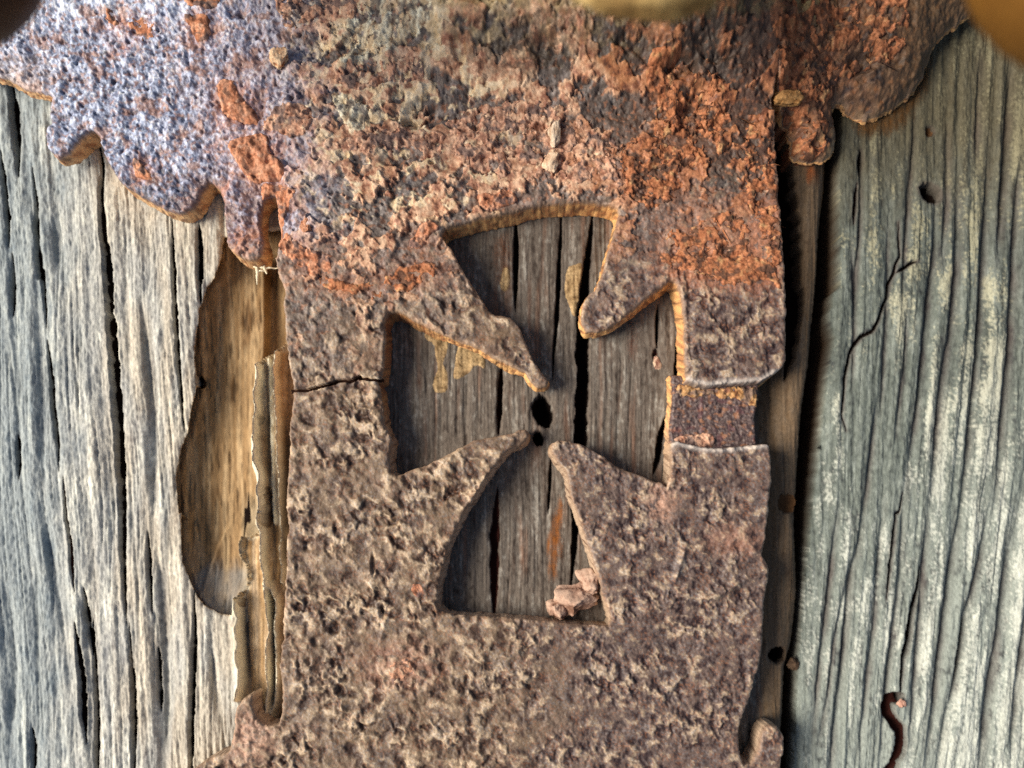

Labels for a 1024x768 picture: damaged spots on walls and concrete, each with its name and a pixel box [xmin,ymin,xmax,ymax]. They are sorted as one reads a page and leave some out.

corrosion [105,8,159,41]
corrosion [184,0,220,42]
corrosion [274,0,366,46]
corrosion [336,0,910,289]
corrosion [132,158,152,180]
corrosion [217,79,438,299]
crack [841,222,916,430]
crack [291,376,385,394]
corrosion [676,384,758,407]
corrosion [674,433,715,448]
corrosion [411,584,423,598]